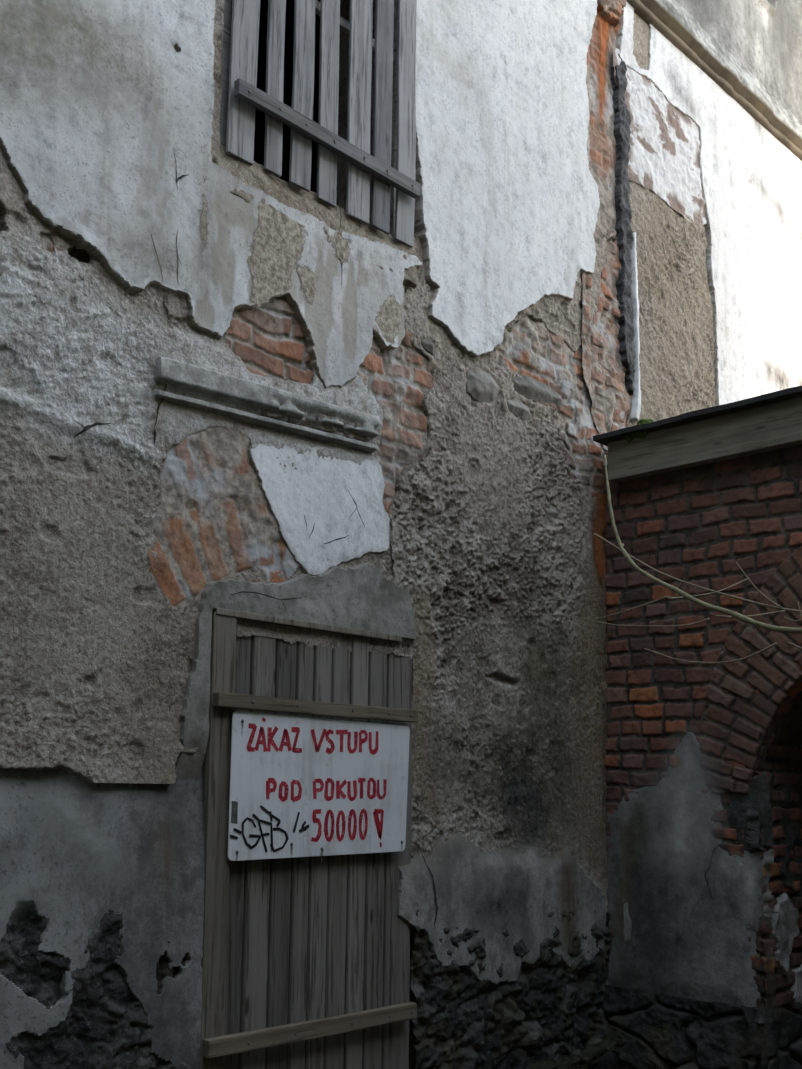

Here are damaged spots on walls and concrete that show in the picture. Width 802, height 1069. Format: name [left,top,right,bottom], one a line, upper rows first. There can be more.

flaking render [0,0,717,912]
flaking render [0,901,190,1069]
flaking render [410,913,612,1069]
flaking render [769,893,802,1011]